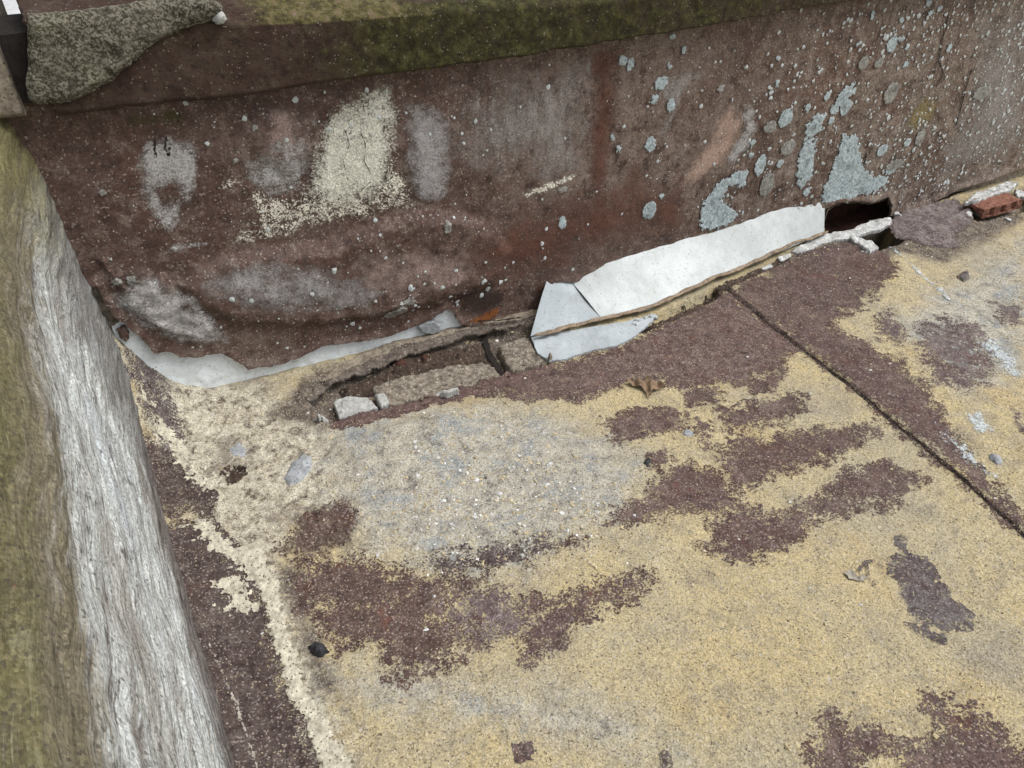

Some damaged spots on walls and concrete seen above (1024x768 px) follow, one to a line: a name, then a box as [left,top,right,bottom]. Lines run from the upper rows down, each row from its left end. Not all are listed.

damp [137,137,196,229]
damp [236,87,449,242]
spalling [339,343,487,398]
peeling [438,199,1024,568]
peeling [112,309,461,768]
peeling [270,496,660,691]